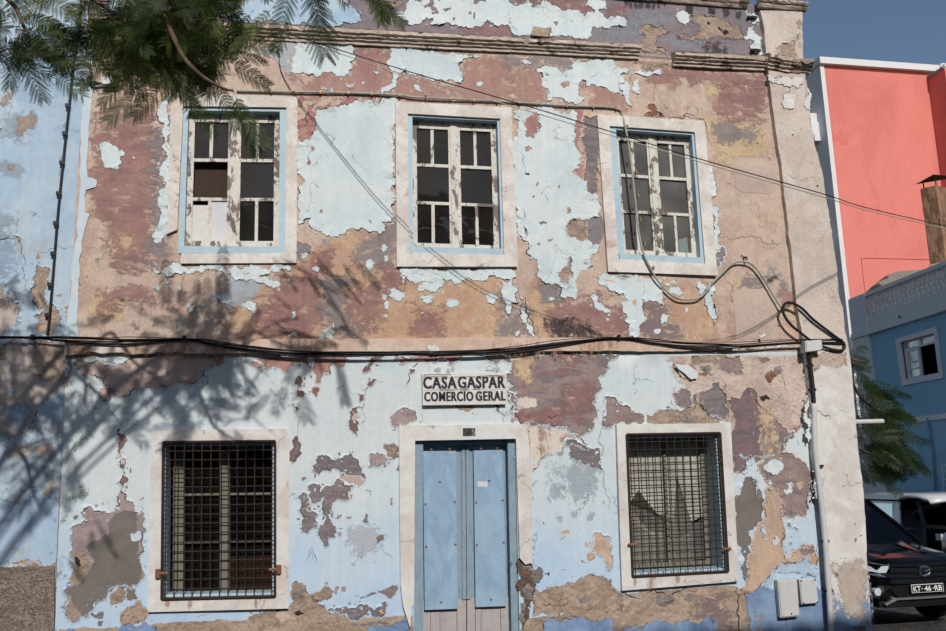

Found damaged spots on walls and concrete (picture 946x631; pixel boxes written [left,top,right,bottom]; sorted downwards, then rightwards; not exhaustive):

peeling [388,0,631,40]
peeling [781,88,812,110]
peeling [86,10,768,342]
spalling [0,253,225,440]
peeling [249,353,349,464]
peeling [346,346,463,437]
spalling [455,405,474,415]
peeling [733,275,795,316]
spalling [4,427,158,631]
peeling [292,443,399,548]
peeling [484,339,876,631]
spalling [245,581,411,631]